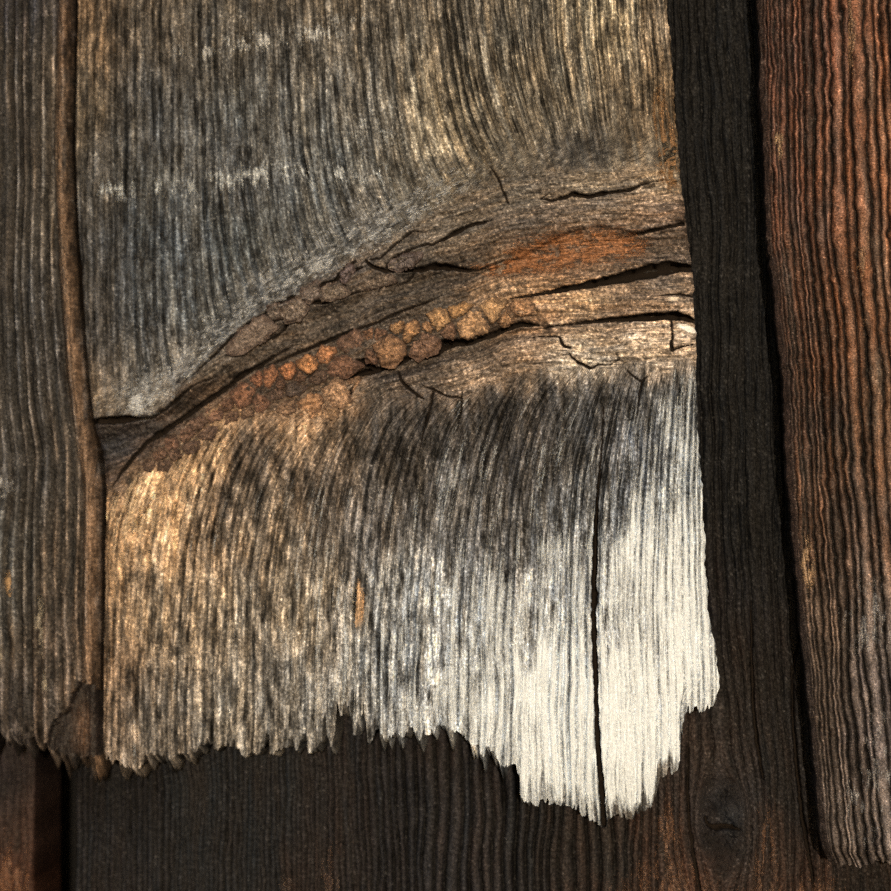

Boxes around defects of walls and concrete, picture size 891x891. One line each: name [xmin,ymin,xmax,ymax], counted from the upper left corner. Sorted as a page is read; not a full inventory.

crack [541,180,664,202]
crack [618,223,683,238]
crack [97,220,505,486]
crack [339,262,694,459]
crack [591,407,607,826]